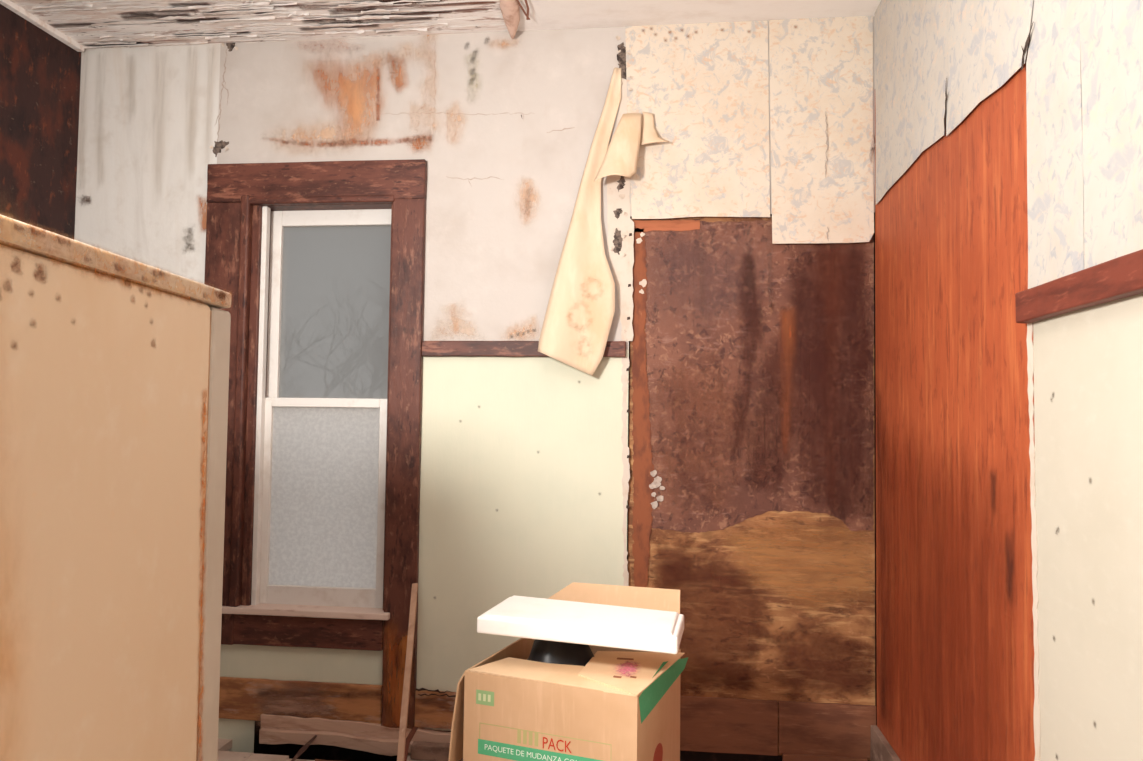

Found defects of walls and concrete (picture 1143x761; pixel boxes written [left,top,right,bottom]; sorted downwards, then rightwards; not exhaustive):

peeling [25,0,530,52]
crack [942,77,950,137]
spalling [609,176,645,256]
peeling [649,470,665,509]
water stain [658,522,873,692]